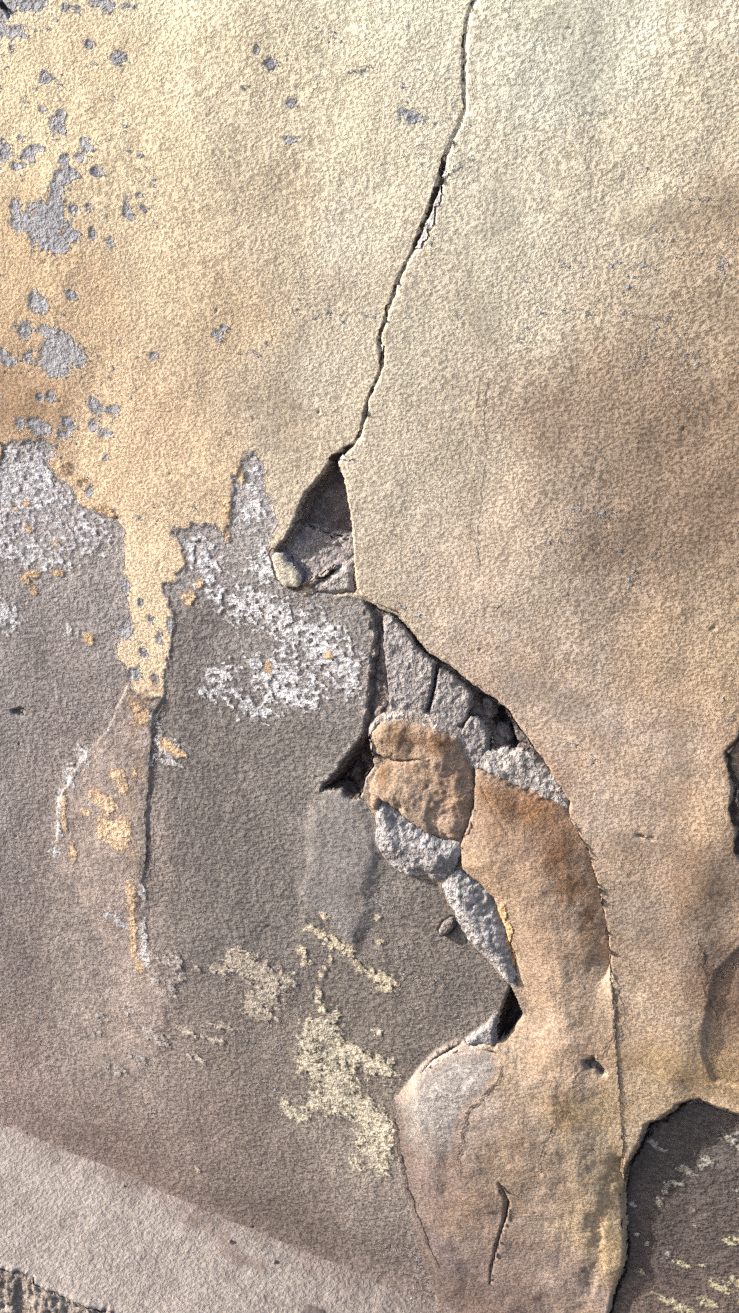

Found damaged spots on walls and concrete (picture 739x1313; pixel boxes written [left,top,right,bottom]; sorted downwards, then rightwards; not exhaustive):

peeling [0,0,135,88]
peeling [0,38,157,266]
peeling [239,42,323,108]
crack [328,0,475,462]
peeling [382,60,476,146]
leakage [0,597,28,637]
leakage [0,445,112,574]
leakage [184,464,365,726]
peeling [0,287,569,1313]
crack [422,1040,502,1178]
crack [488,784,616,1286]
spalling [612,1101,739,1313]